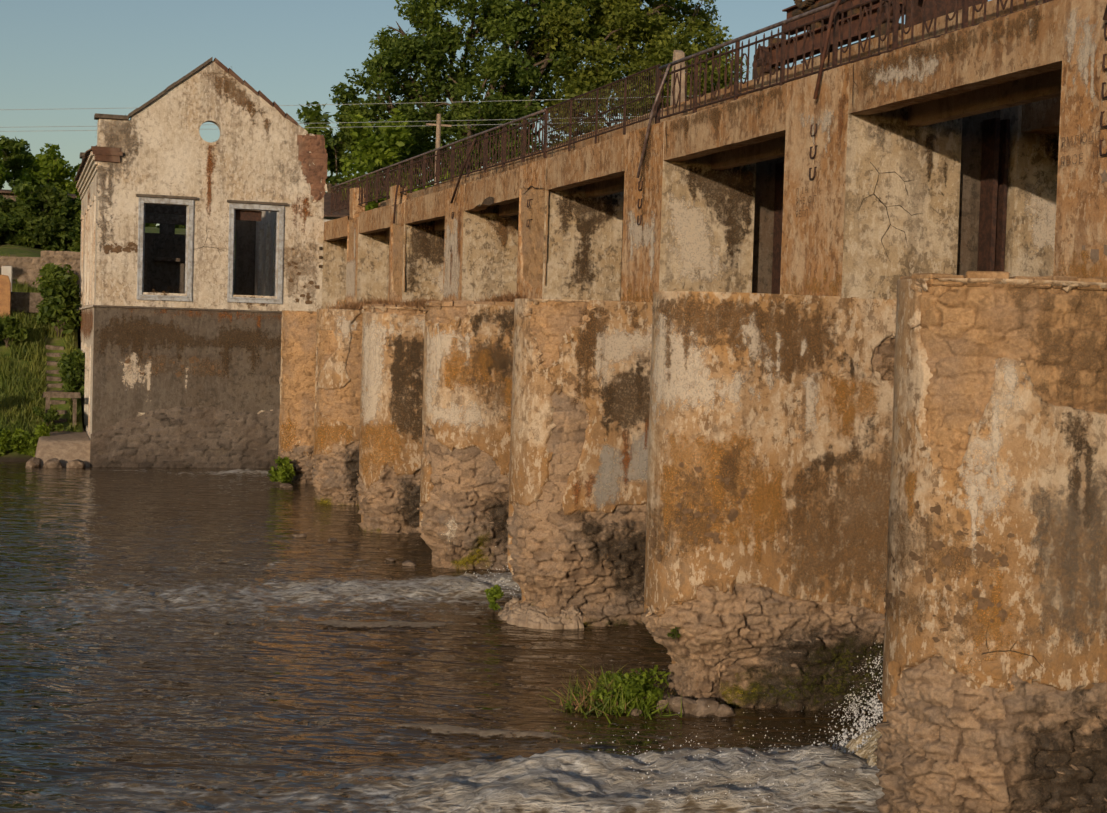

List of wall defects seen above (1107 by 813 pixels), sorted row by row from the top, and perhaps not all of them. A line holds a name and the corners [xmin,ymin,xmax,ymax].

corrosion [206,145,216,214]
spalling [297,133,328,203]
peeling [103,242,138,254]
spalling [520,188,596,367]
leakage [95,315,281,390]
leakage [314,308,514,491]
leakage [571,295,917,612]
spalling [90,248,1107,813]
leakage [743,628,884,712]